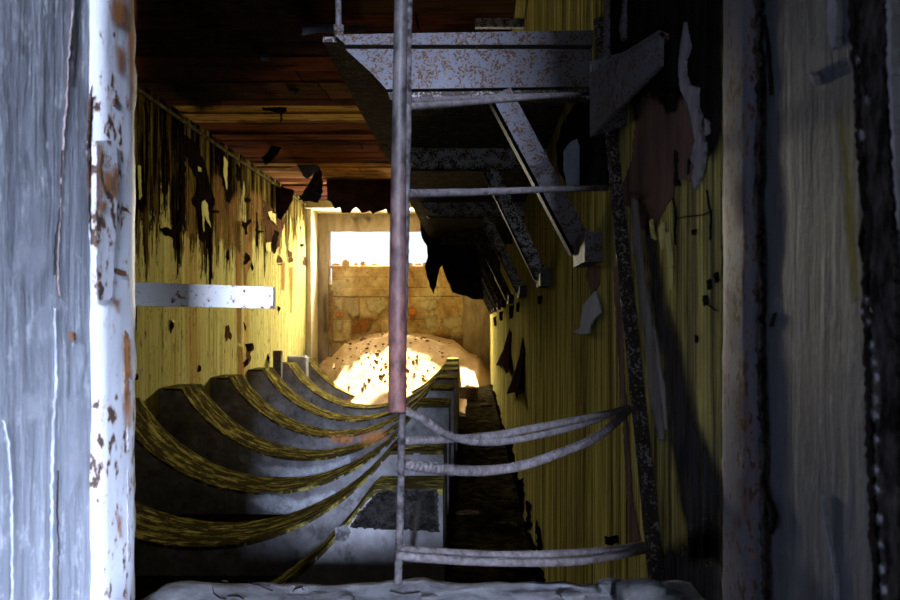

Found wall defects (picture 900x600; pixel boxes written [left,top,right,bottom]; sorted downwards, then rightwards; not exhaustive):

rust [112,0,134,96]
rust [97,145,118,212]
peeling [135,102,150,223]
peeling [160,112,240,243]
peeling [261,145,282,165]
peeling [622,22,711,290]
spalling [702,272,719,306]